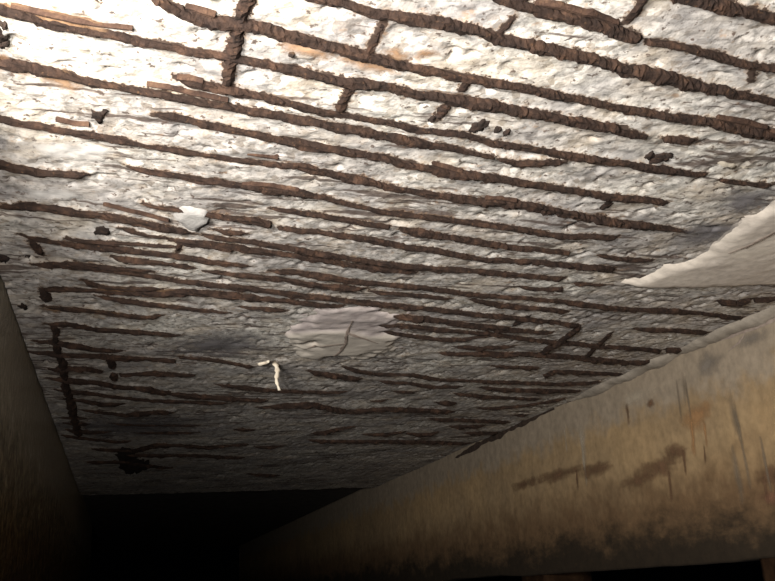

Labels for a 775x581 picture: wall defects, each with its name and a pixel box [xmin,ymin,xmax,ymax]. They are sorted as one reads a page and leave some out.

corrosion [41,17,102,30]
corrosion [285,43,325,57]
corrosion [343,58,392,71]
corrosion [44,78,74,88]
spalling [0,0,775,177]
spalling [0,31,775,495]
corrosion [627,446,686,498]